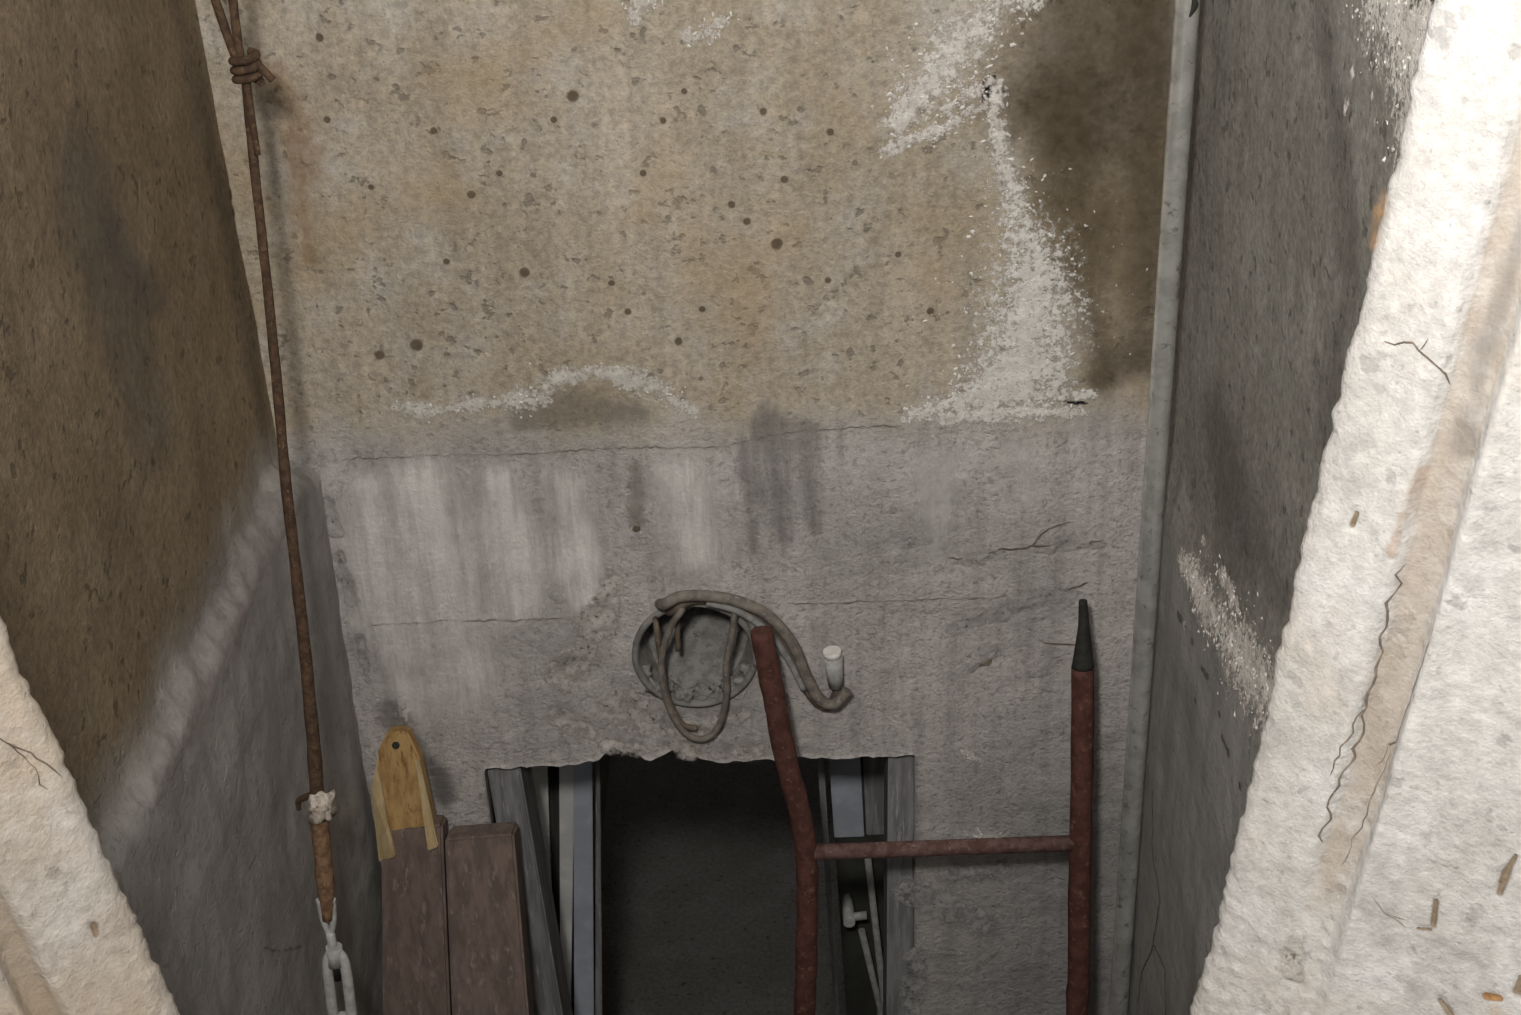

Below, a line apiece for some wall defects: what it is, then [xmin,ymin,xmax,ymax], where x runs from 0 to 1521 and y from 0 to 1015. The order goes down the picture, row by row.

leakage [1343,0,1434,171]
leakage [871,0,1171,438]
leakage [390,363,700,425]
crack [0,738,61,789]
leakage [341,454,602,720]
leakage [660,456,718,571]
leakage [1177,535,1275,730]
crack [1317,564,1434,866]